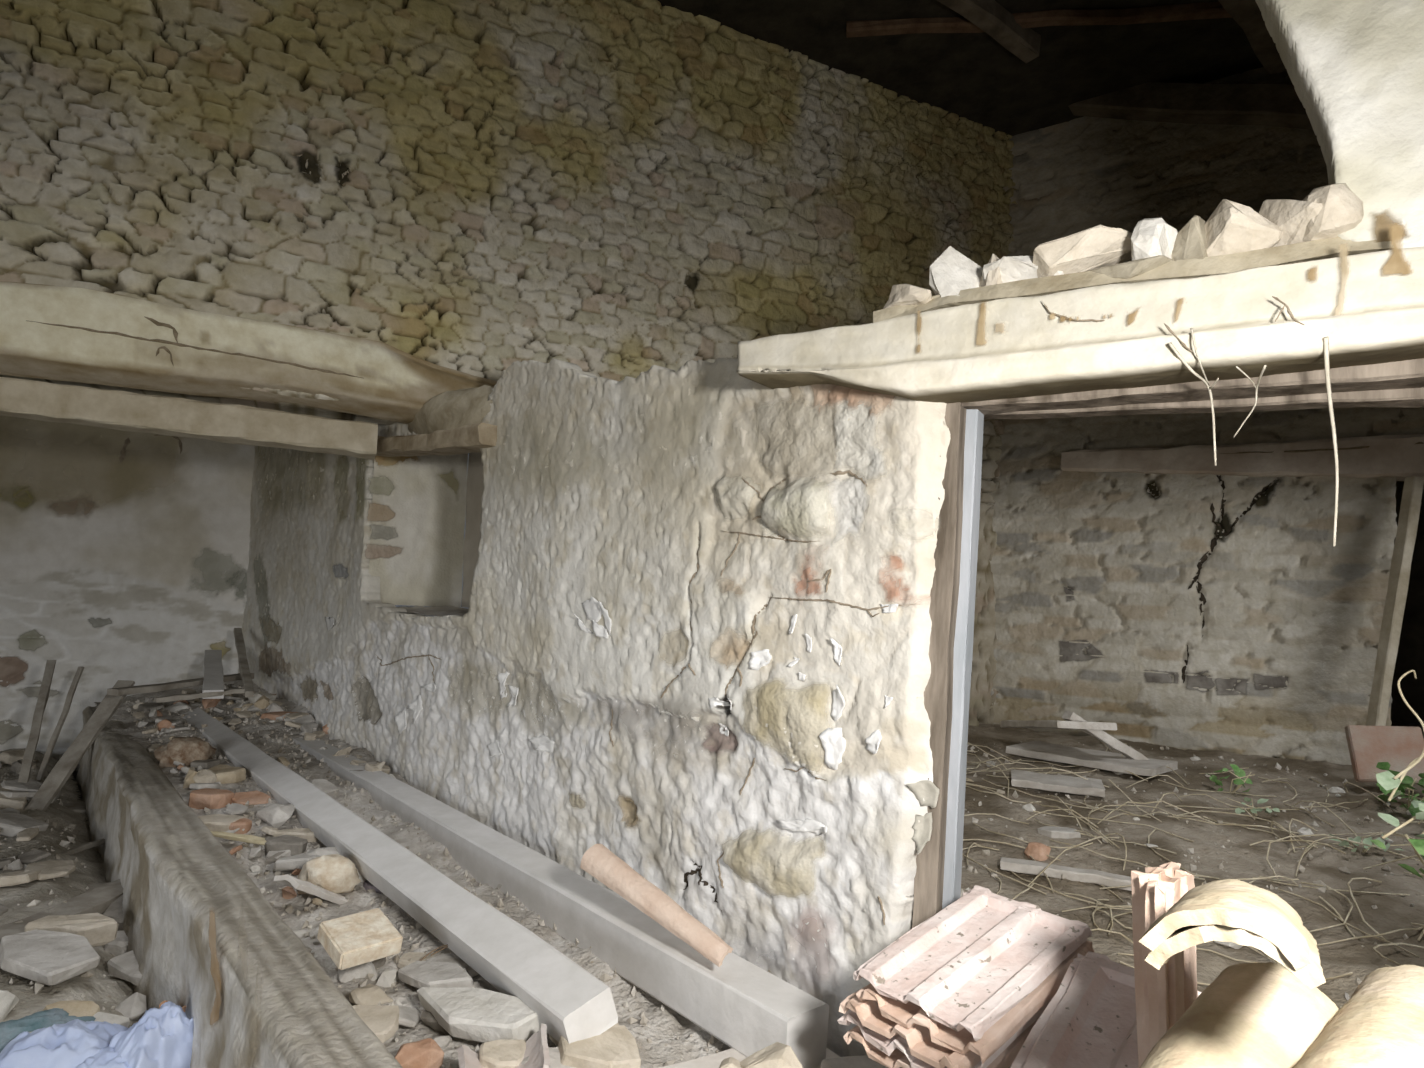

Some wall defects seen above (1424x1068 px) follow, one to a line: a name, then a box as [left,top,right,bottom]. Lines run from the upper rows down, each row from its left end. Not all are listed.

flaking render [890,509,938,539]
crack [660,476,921,699]
flaking render [796,547,820,594]
flaking render [879,556,910,613]
crack [1182,475,1278,683]
flaking render [0,630,59,697]
spalling [710,629,772,670]
peeling [788,614,812,681]
peeling [829,637,842,666]
peeling [819,685,846,770]